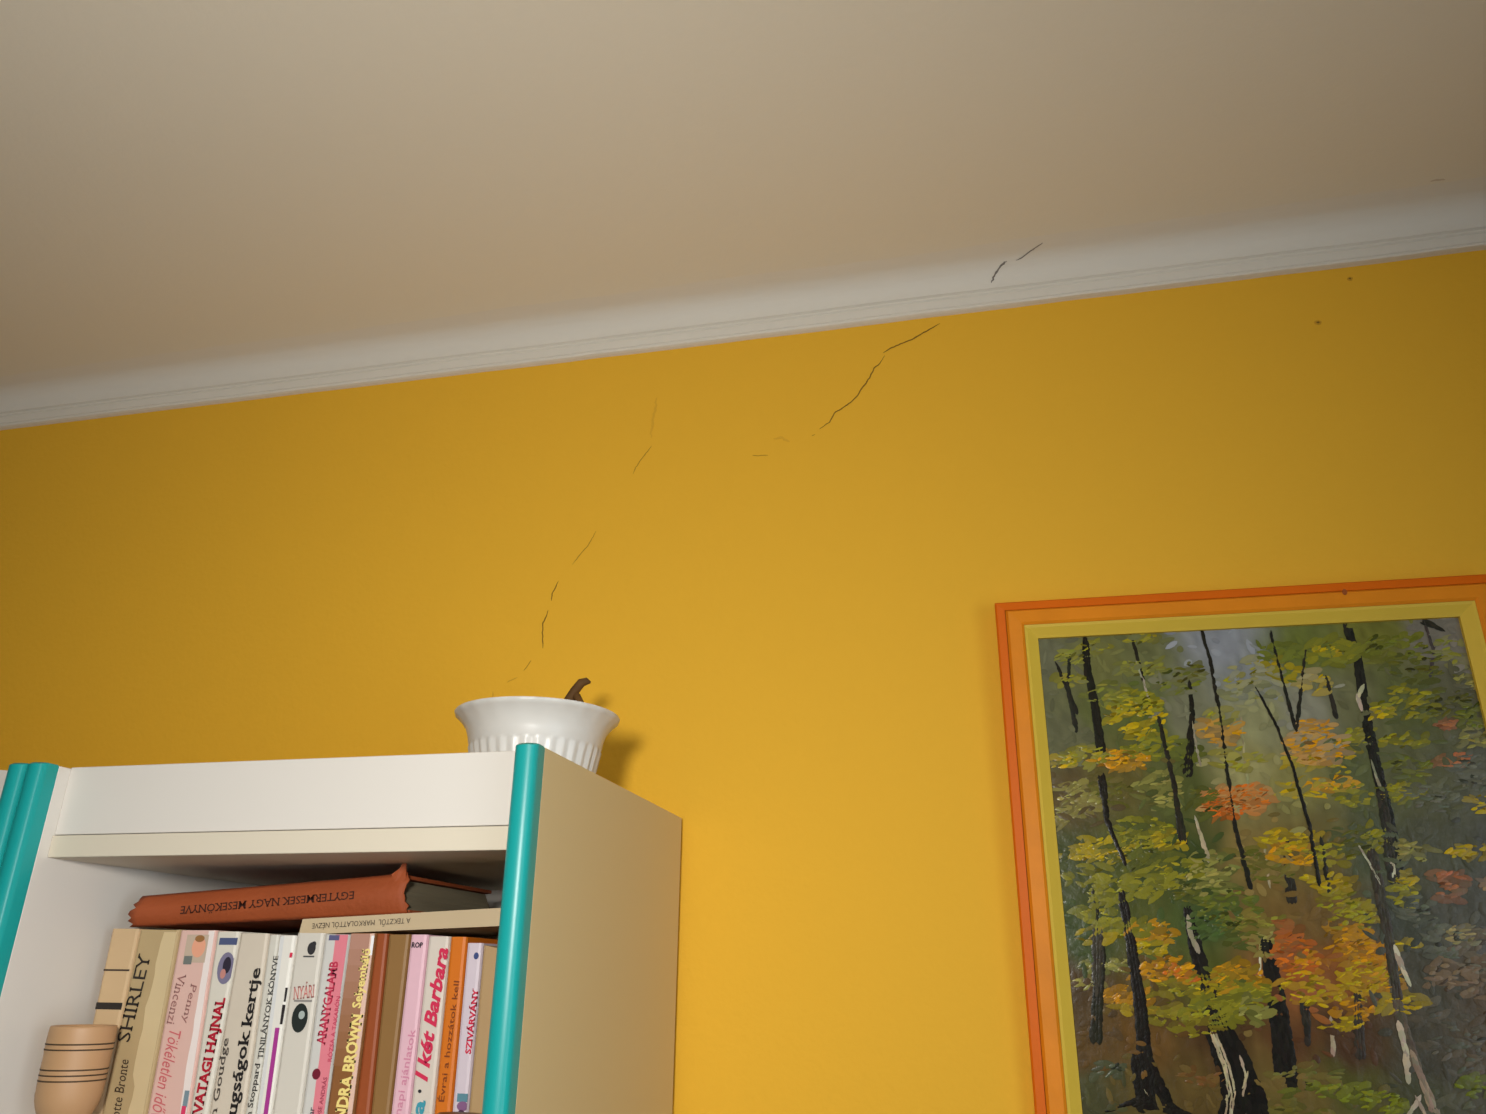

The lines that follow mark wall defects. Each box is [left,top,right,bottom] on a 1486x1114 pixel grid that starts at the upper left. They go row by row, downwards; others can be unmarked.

crack [752,324,938,456]
crack [492,533,595,697]